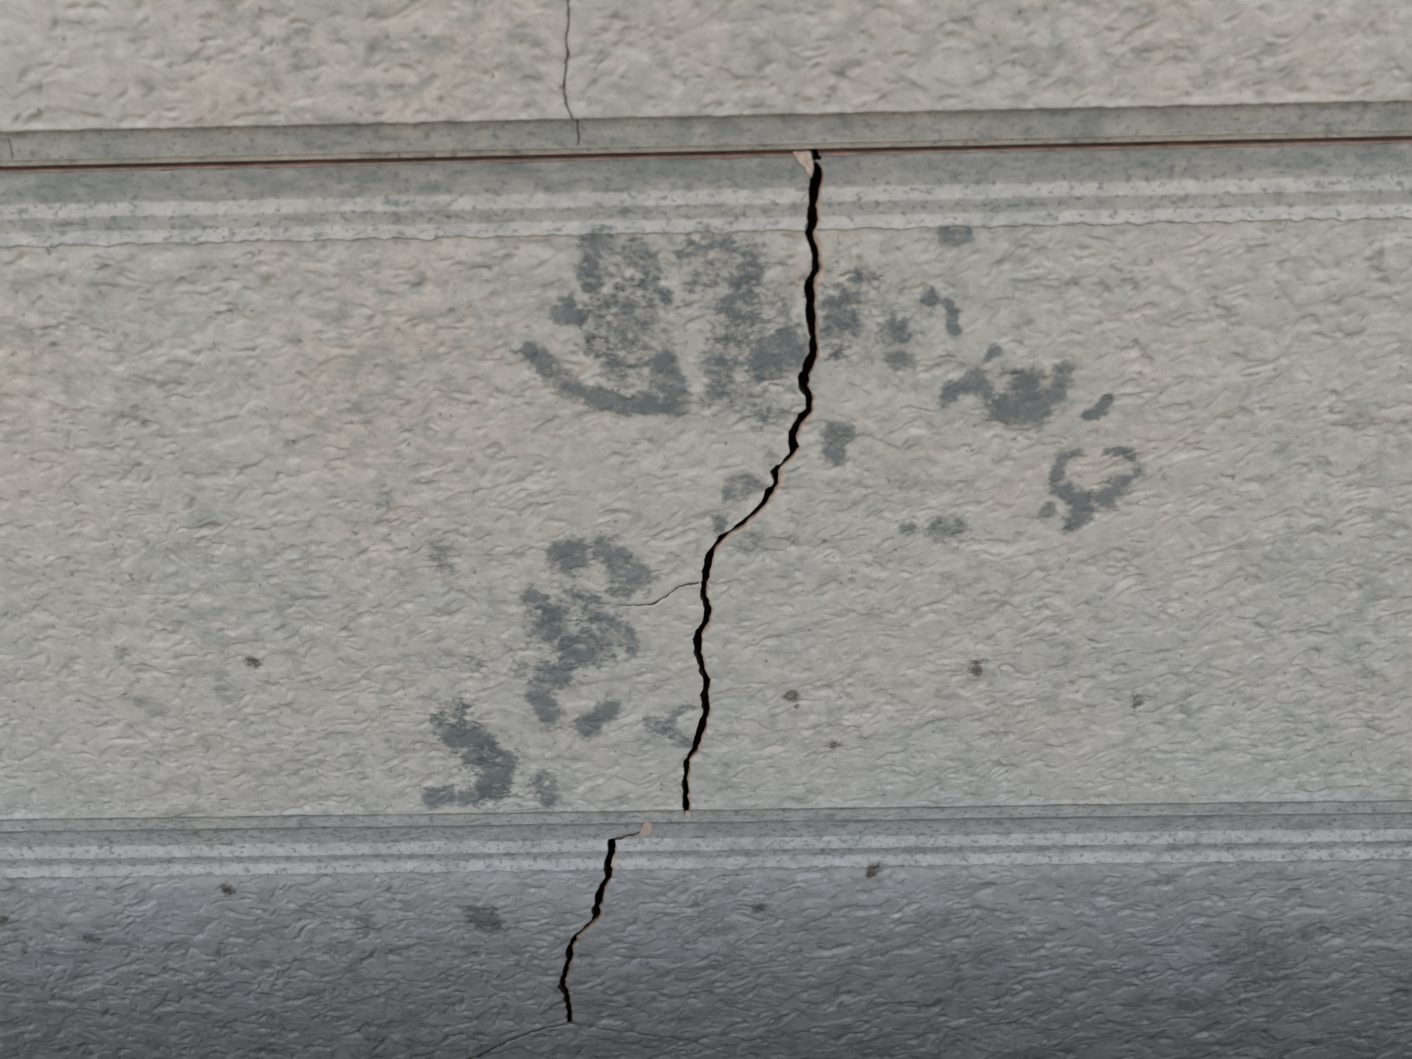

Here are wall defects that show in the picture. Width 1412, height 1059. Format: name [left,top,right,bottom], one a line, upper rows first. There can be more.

crack [617,149,826,811]
crack [467,832,726,1059]